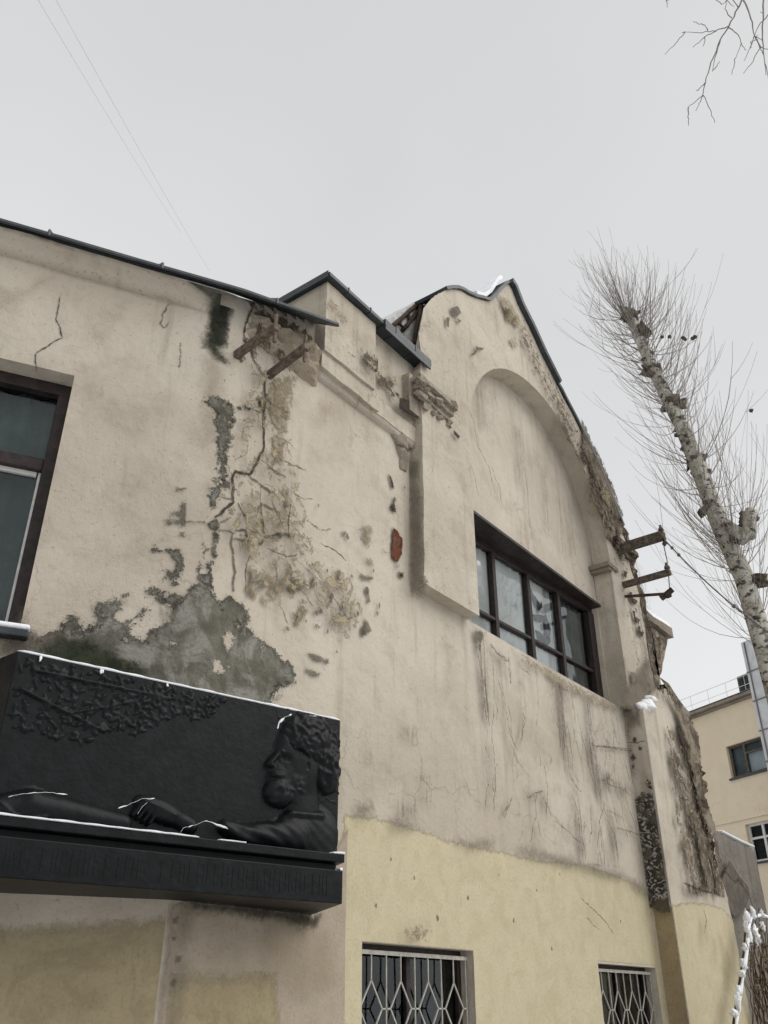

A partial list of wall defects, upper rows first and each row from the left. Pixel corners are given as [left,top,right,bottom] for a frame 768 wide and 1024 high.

crack [35,298,63,372]
leakage [209,291,233,346]
leakage [128,663,145,675]
flaking render [18,301,380,703]
crack [215,308,346,623]
crack [476,642,649,878]
flaking render [499,295,750,917]